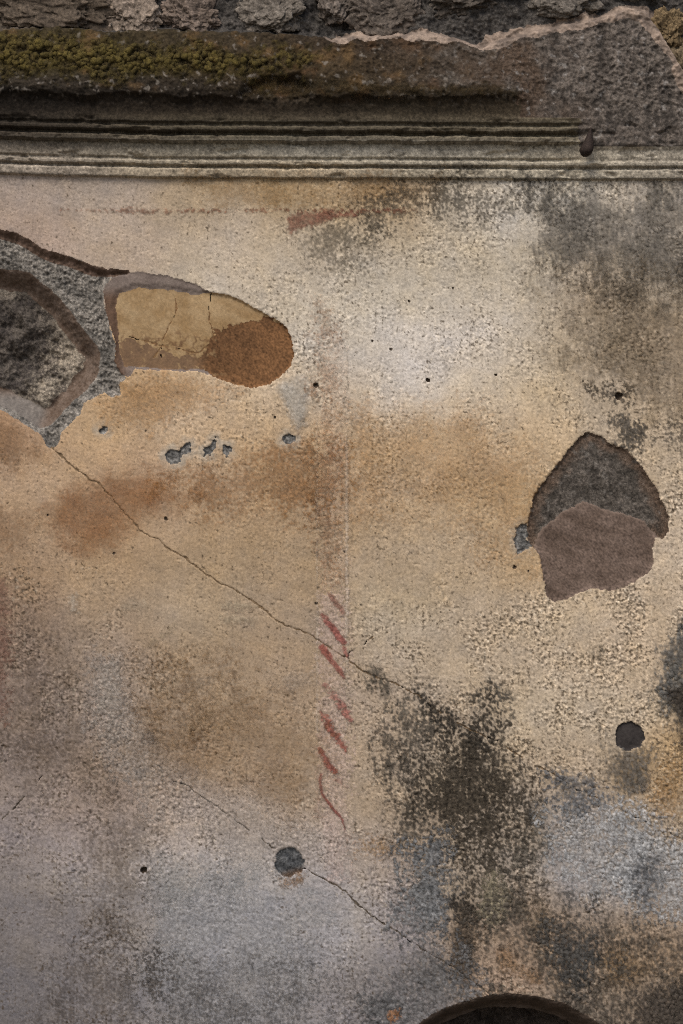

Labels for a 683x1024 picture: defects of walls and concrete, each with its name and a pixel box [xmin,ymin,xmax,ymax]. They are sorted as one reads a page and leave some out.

leakage [530,175,683,304]
spalling [0,229,296,448]
spalling [165,436,232,465]
leakage [584,381,683,453]
spalling [513,432,670,602]
crack [50,447,564,781]
leakage [648,623,683,730]
crack [189,786,274,849]
leakage [353,665,683,1024]
crack [308,869,490,995]